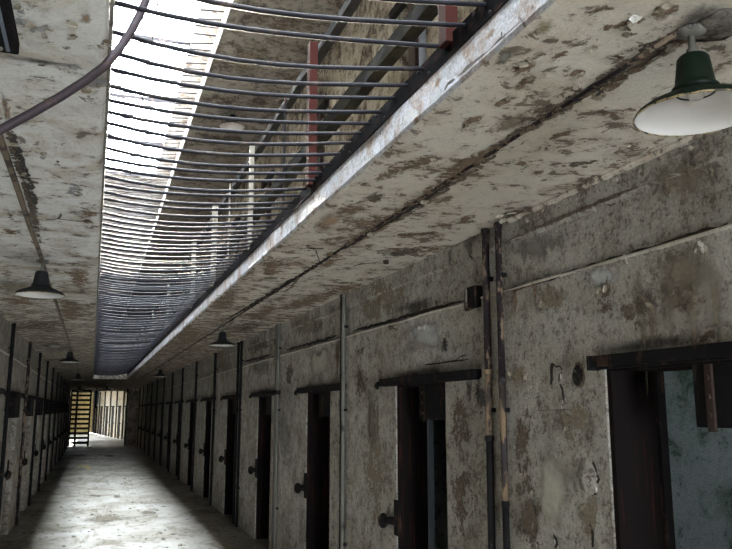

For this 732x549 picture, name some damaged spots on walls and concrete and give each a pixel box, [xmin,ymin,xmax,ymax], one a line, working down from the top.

peeling [13,3,53,39]
crack [443,17,526,92]
spalling [317,1,701,267]
spalling [4,131,42,243]
peeling [66,184,99,224]
peeling [301,195,325,220]
crack [503,187,638,246]
peeling [249,247,304,275]
crack [227,248,340,320]
crack [507,223,728,292]
crack [244,300,464,362]
crack [550,363,564,409]